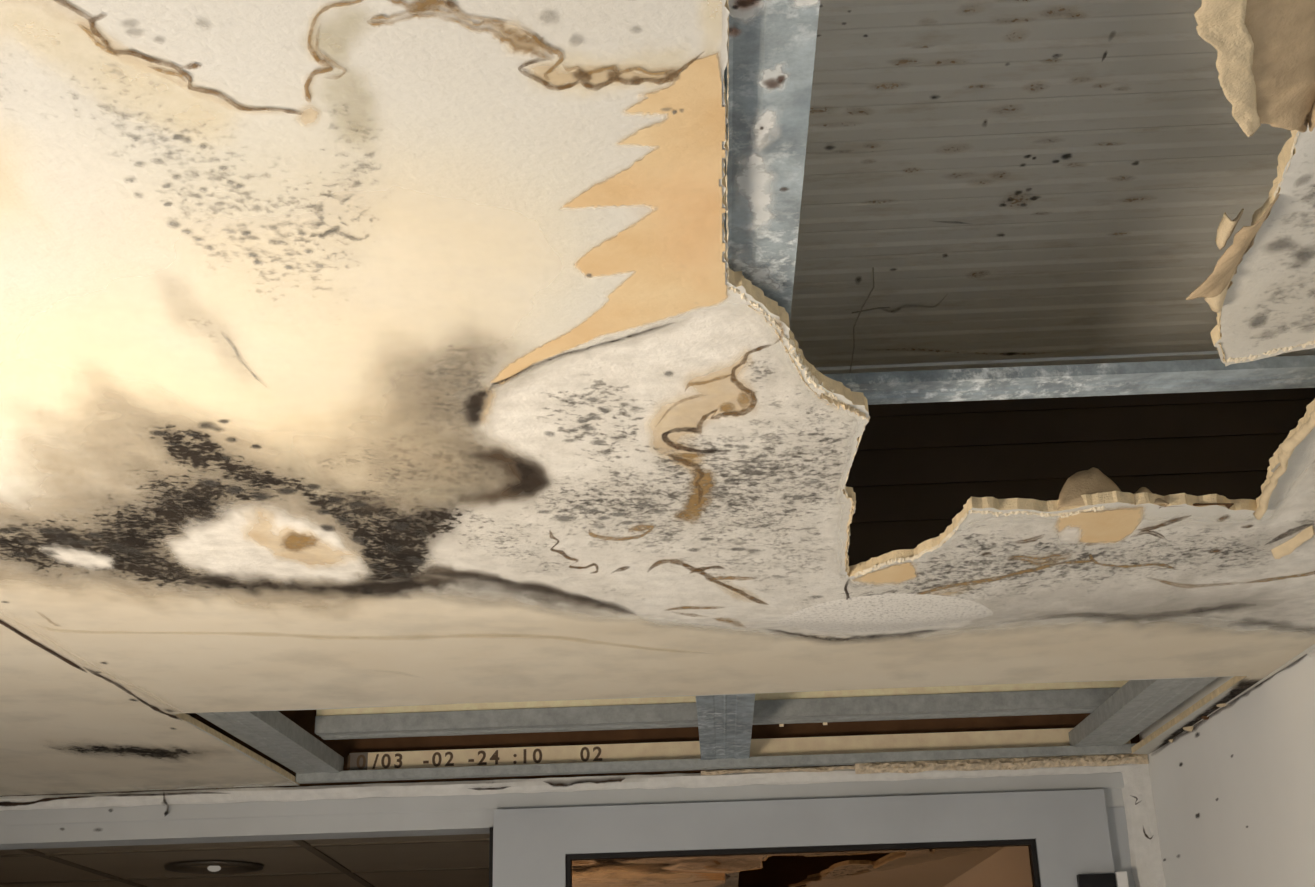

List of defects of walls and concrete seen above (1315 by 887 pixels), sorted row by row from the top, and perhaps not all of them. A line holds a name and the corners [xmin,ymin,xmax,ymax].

damp [55,0,363,119]
damp [370,0,697,90]
rust [728,0,764,35]
rust [759,64,788,89]
rust [737,111,788,225]
damp [0,250,623,611]
peeling [0,128,1315,796]
damp [539,345,841,603]
damp [670,606,739,624]